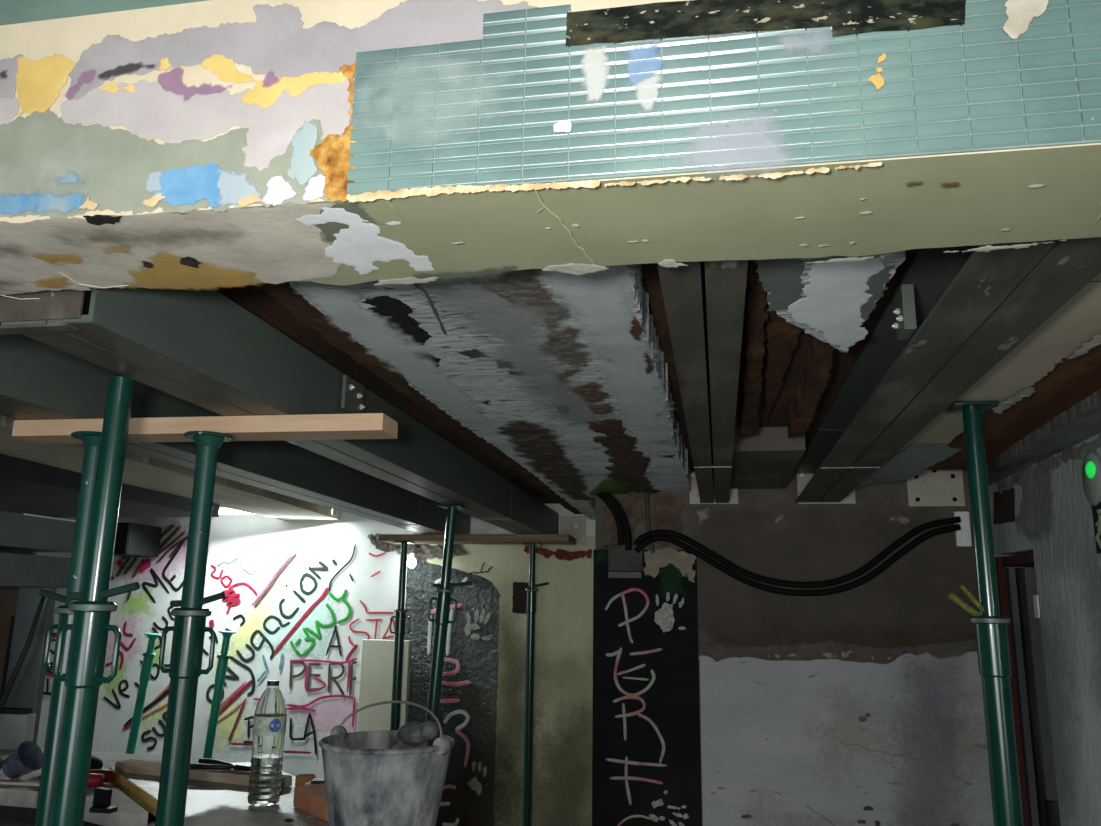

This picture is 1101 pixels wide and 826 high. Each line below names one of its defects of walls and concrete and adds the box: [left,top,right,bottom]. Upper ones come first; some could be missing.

spalling [0,0,980,664]
spalling [944,240,1066,253]